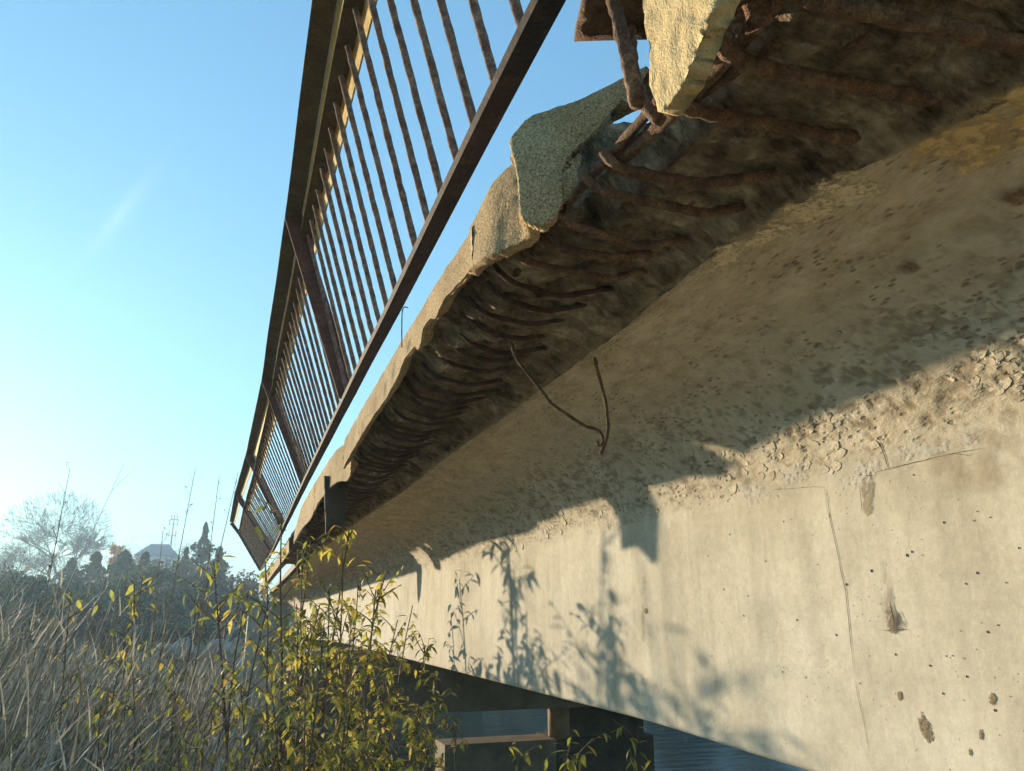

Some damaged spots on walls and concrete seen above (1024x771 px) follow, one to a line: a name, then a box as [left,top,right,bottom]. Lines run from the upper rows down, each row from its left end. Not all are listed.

corrosion [907,87,1024,174]
spalling [276,0,1024,567]
crack [877,445,982,472]
leakage [885,604,905,633]